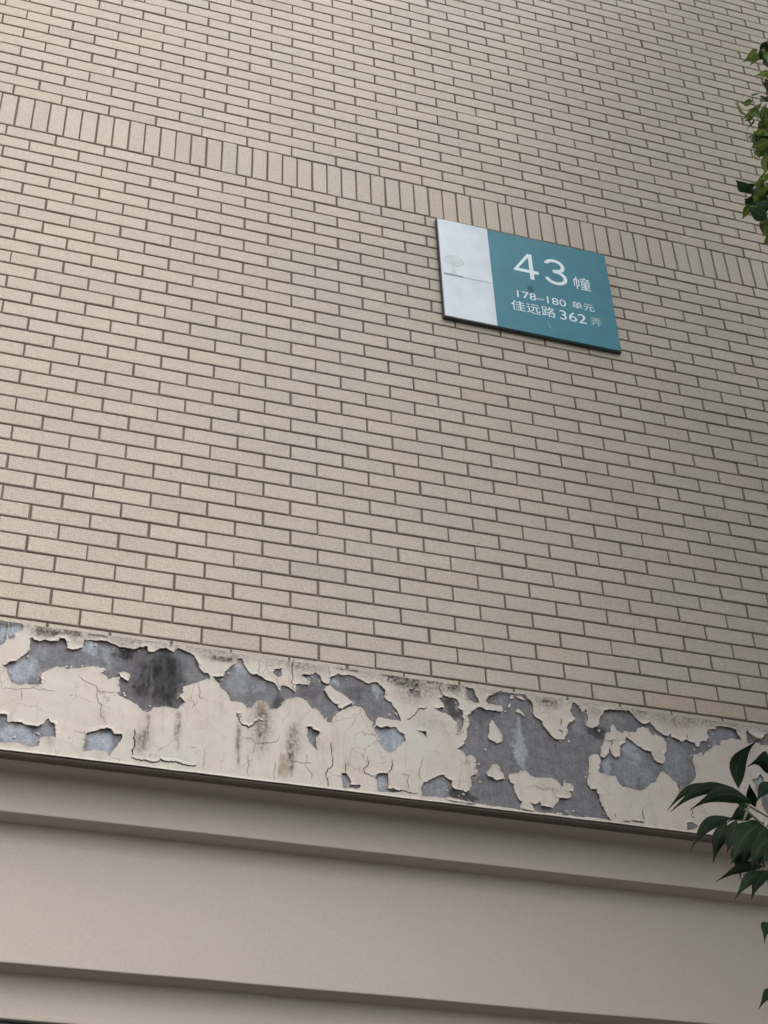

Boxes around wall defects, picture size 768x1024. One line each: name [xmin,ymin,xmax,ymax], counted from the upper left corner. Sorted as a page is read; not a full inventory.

peeling [0,622,405,755]
crack [407,685,444,720]
crack [131,730,205,767]
crack [236,711,423,794]
peeling [421,688,768,820]
peeling [342,774,360,789]
peeling [375,774,399,793]